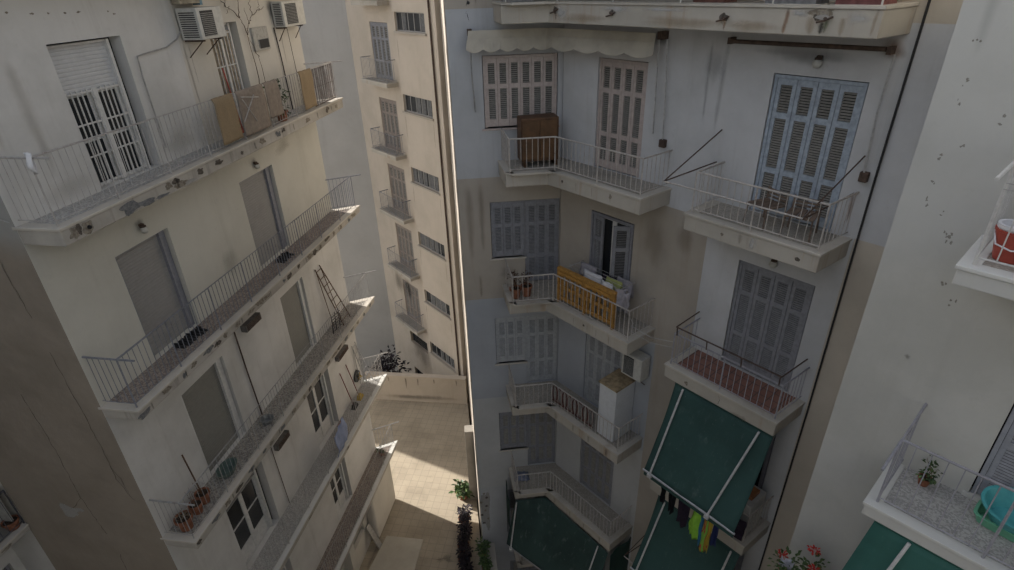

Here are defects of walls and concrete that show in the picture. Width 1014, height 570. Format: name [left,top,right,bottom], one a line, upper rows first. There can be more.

peeling [119,168,203,216]
spalling [69,220,94,239]